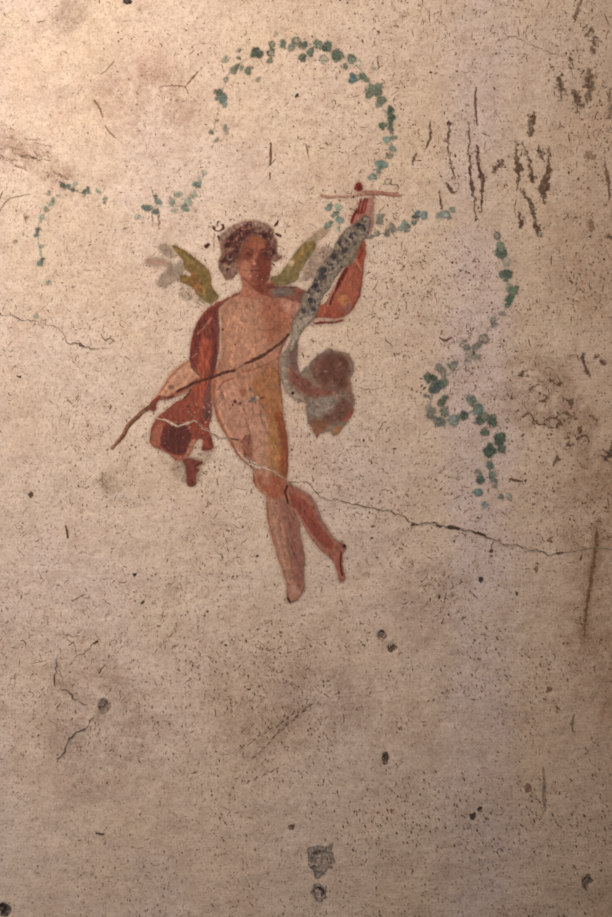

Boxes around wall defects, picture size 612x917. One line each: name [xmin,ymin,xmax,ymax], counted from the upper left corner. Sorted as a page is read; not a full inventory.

crack [0,313,114,350]
crack [157,418,608,556]
crack [52,634,98,761]
spalling [307,843,335,902]